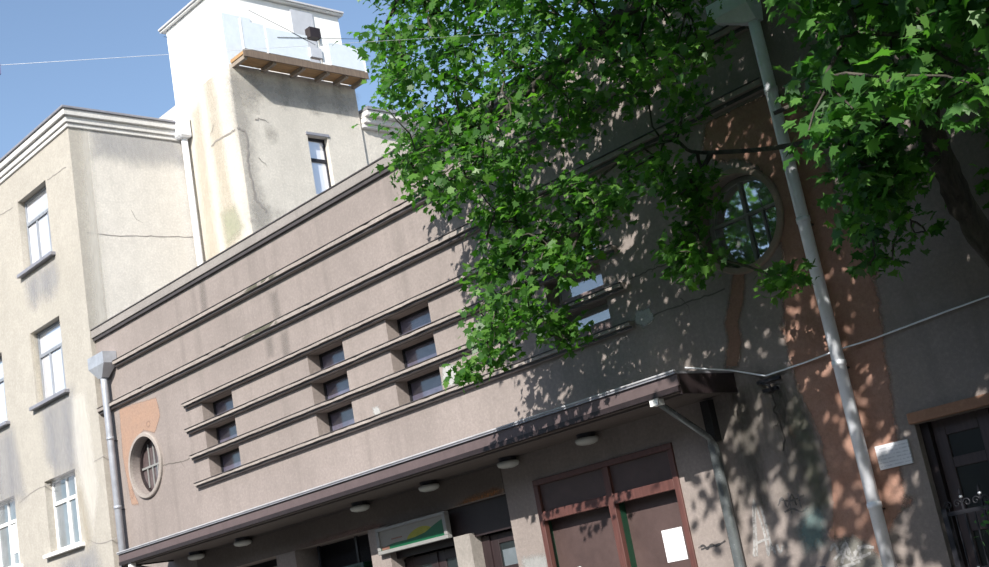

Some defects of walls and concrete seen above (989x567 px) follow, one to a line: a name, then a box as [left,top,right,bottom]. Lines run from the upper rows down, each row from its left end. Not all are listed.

crack [210,118,268,213]
crack [87,210,194,238]
peeling [703,94,883,567]
peeling [781,96,912,532]
peeling [120,398,160,505]